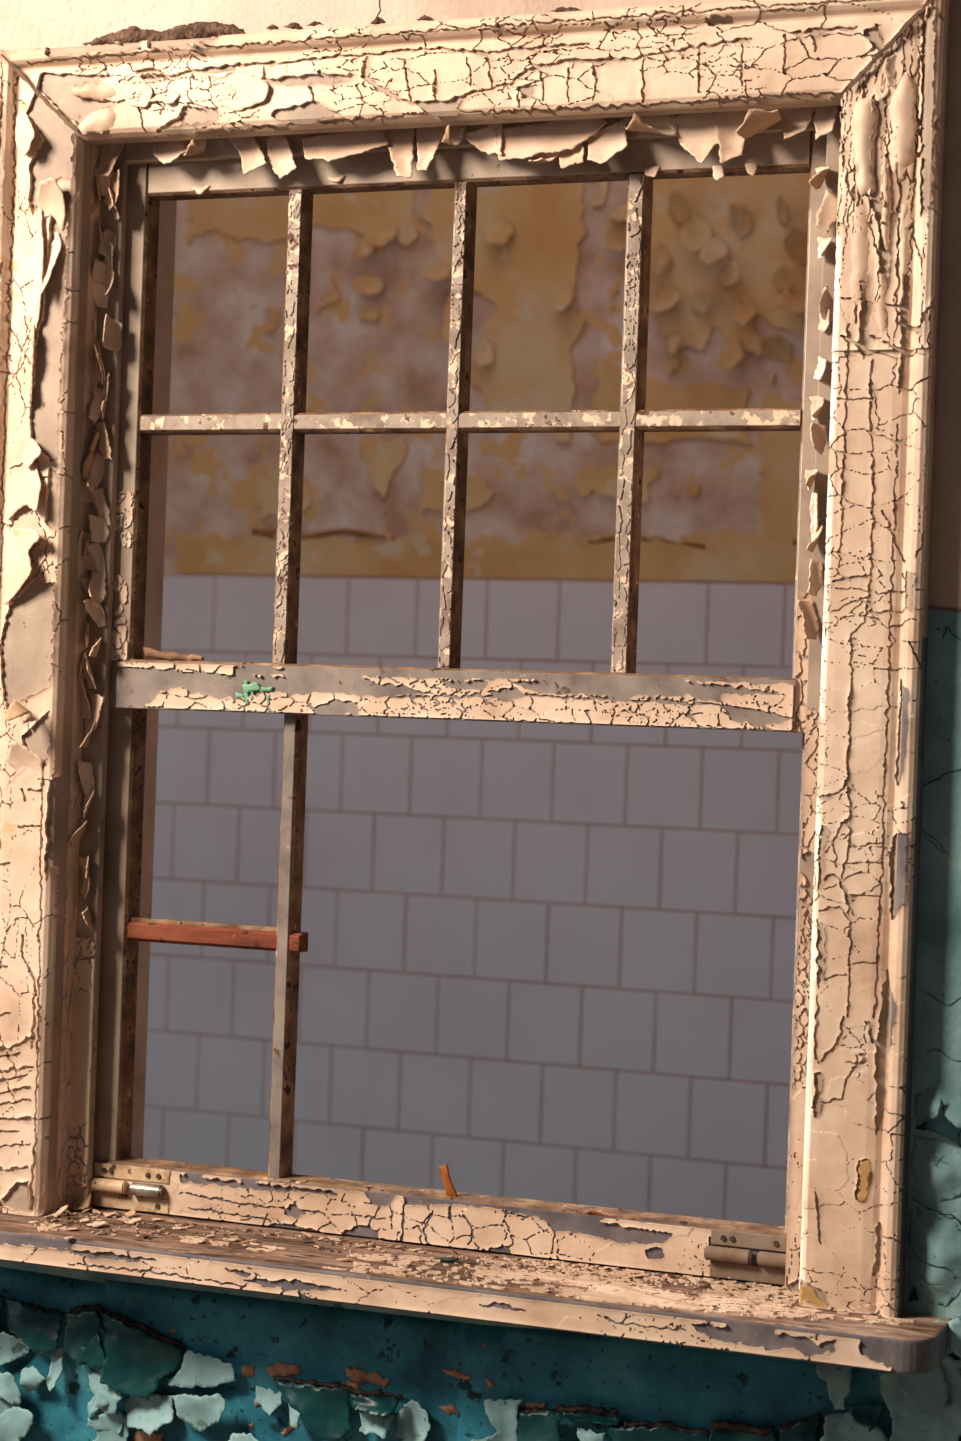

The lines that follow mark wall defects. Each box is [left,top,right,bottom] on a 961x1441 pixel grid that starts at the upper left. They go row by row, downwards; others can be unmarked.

peeling [229,135,297,179]
peeling [302,128,414,178]
peeling [416,126,444,171]
peeling [498,118,607,161]
peeling [587,119,628,164]
peeling [668,106,838,164]
peeling [179,185,313,678]
peeling [79,228,236,748]
peeling [145,675,794,730]
peeling [300,143,939,1325]
peeling [102,1171,711,1276]
peeling [0,1243,961,1441]